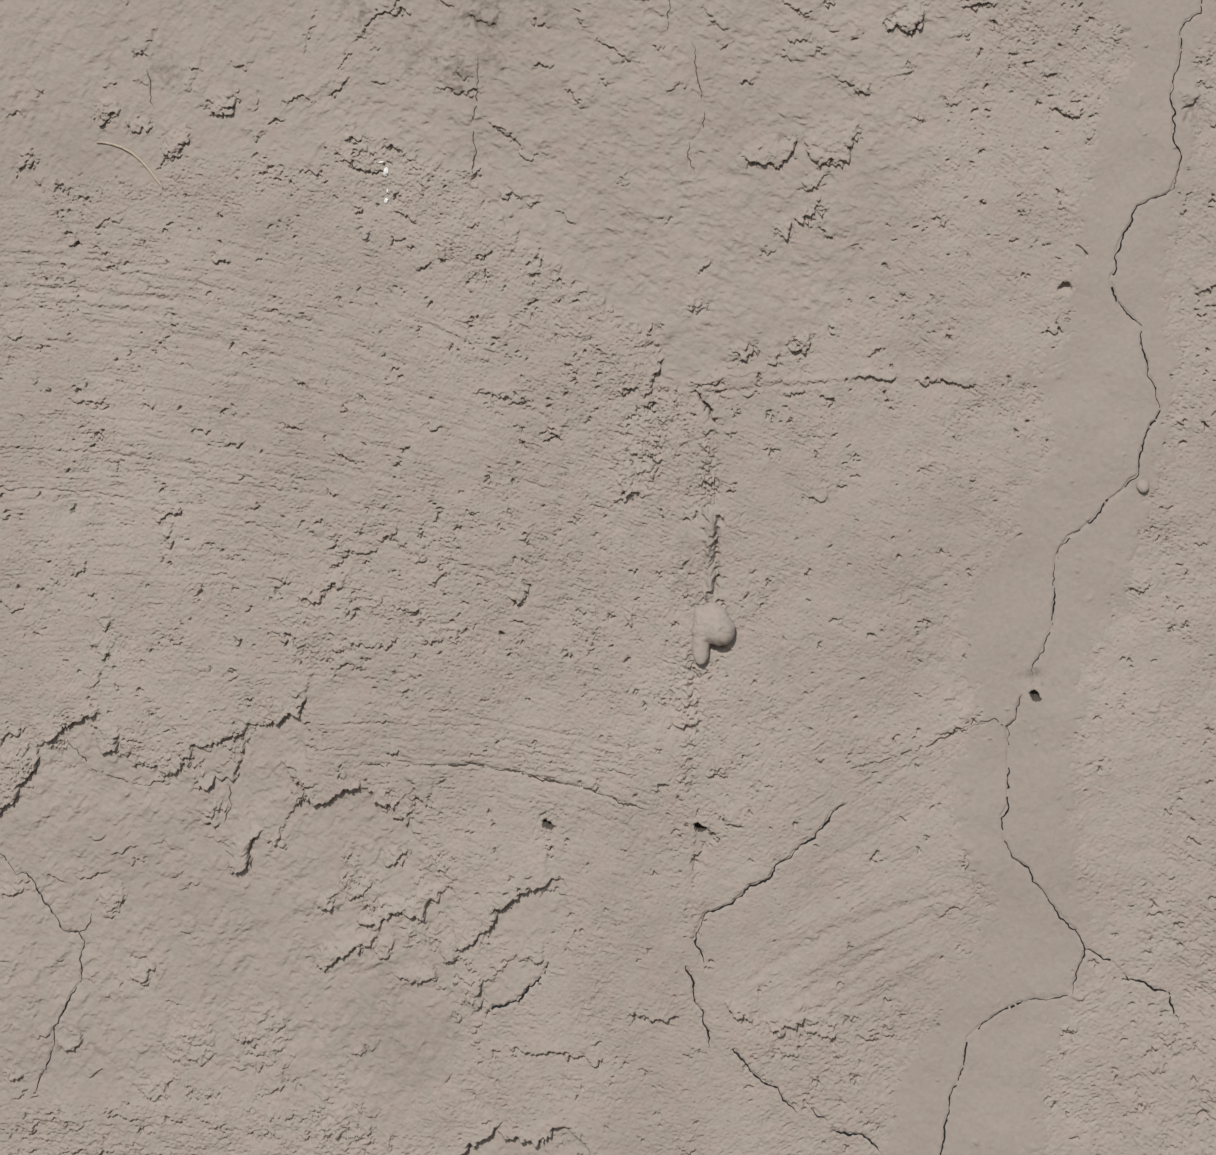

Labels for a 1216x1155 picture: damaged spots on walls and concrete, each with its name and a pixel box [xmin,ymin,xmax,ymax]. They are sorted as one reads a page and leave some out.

crack [667,0,705,173]
crack [852,0,1202,1155]
crack [0,853,92,1094]
spalling [0,705,570,1140]
crack [685,802,879,1151]